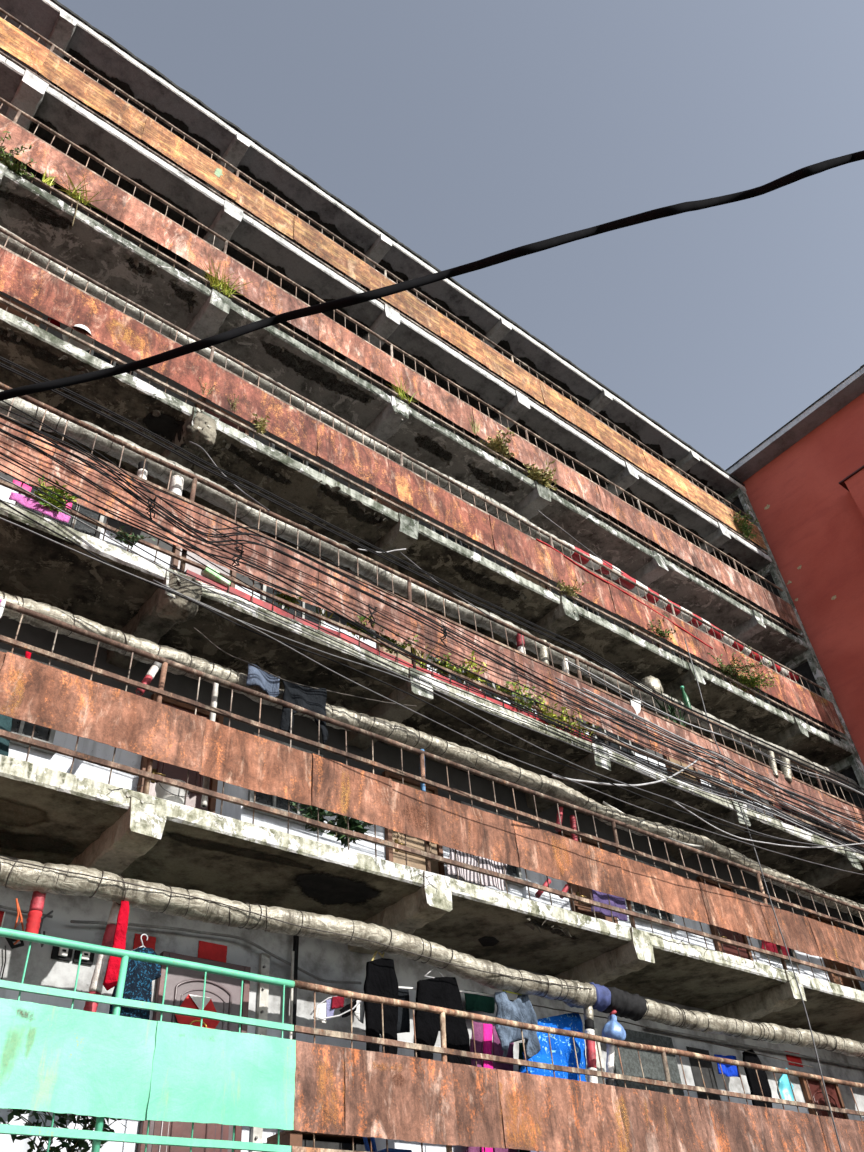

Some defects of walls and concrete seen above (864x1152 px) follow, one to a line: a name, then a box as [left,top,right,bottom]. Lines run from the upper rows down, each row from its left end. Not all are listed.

damp [0,797,74,855]